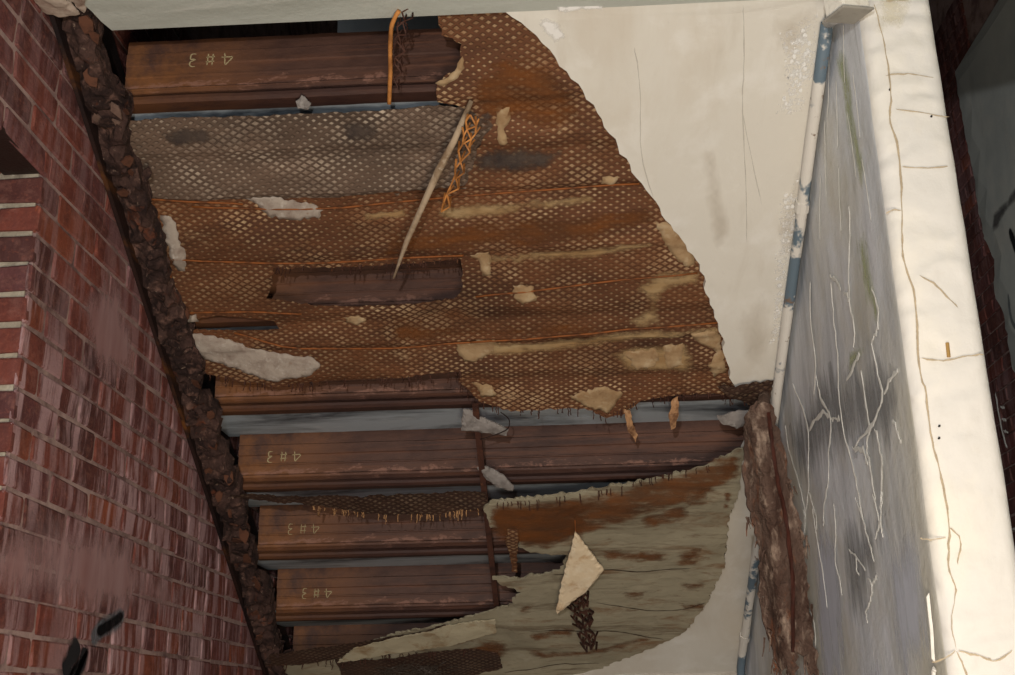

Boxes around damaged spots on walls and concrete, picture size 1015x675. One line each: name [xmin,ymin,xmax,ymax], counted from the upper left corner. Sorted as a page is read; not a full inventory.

rust [478,63,574,127]
crack [785,0,1012,675]
water stain [798,376,894,465]
rust [492,457,737,549]
water stain [818,538,843,675]